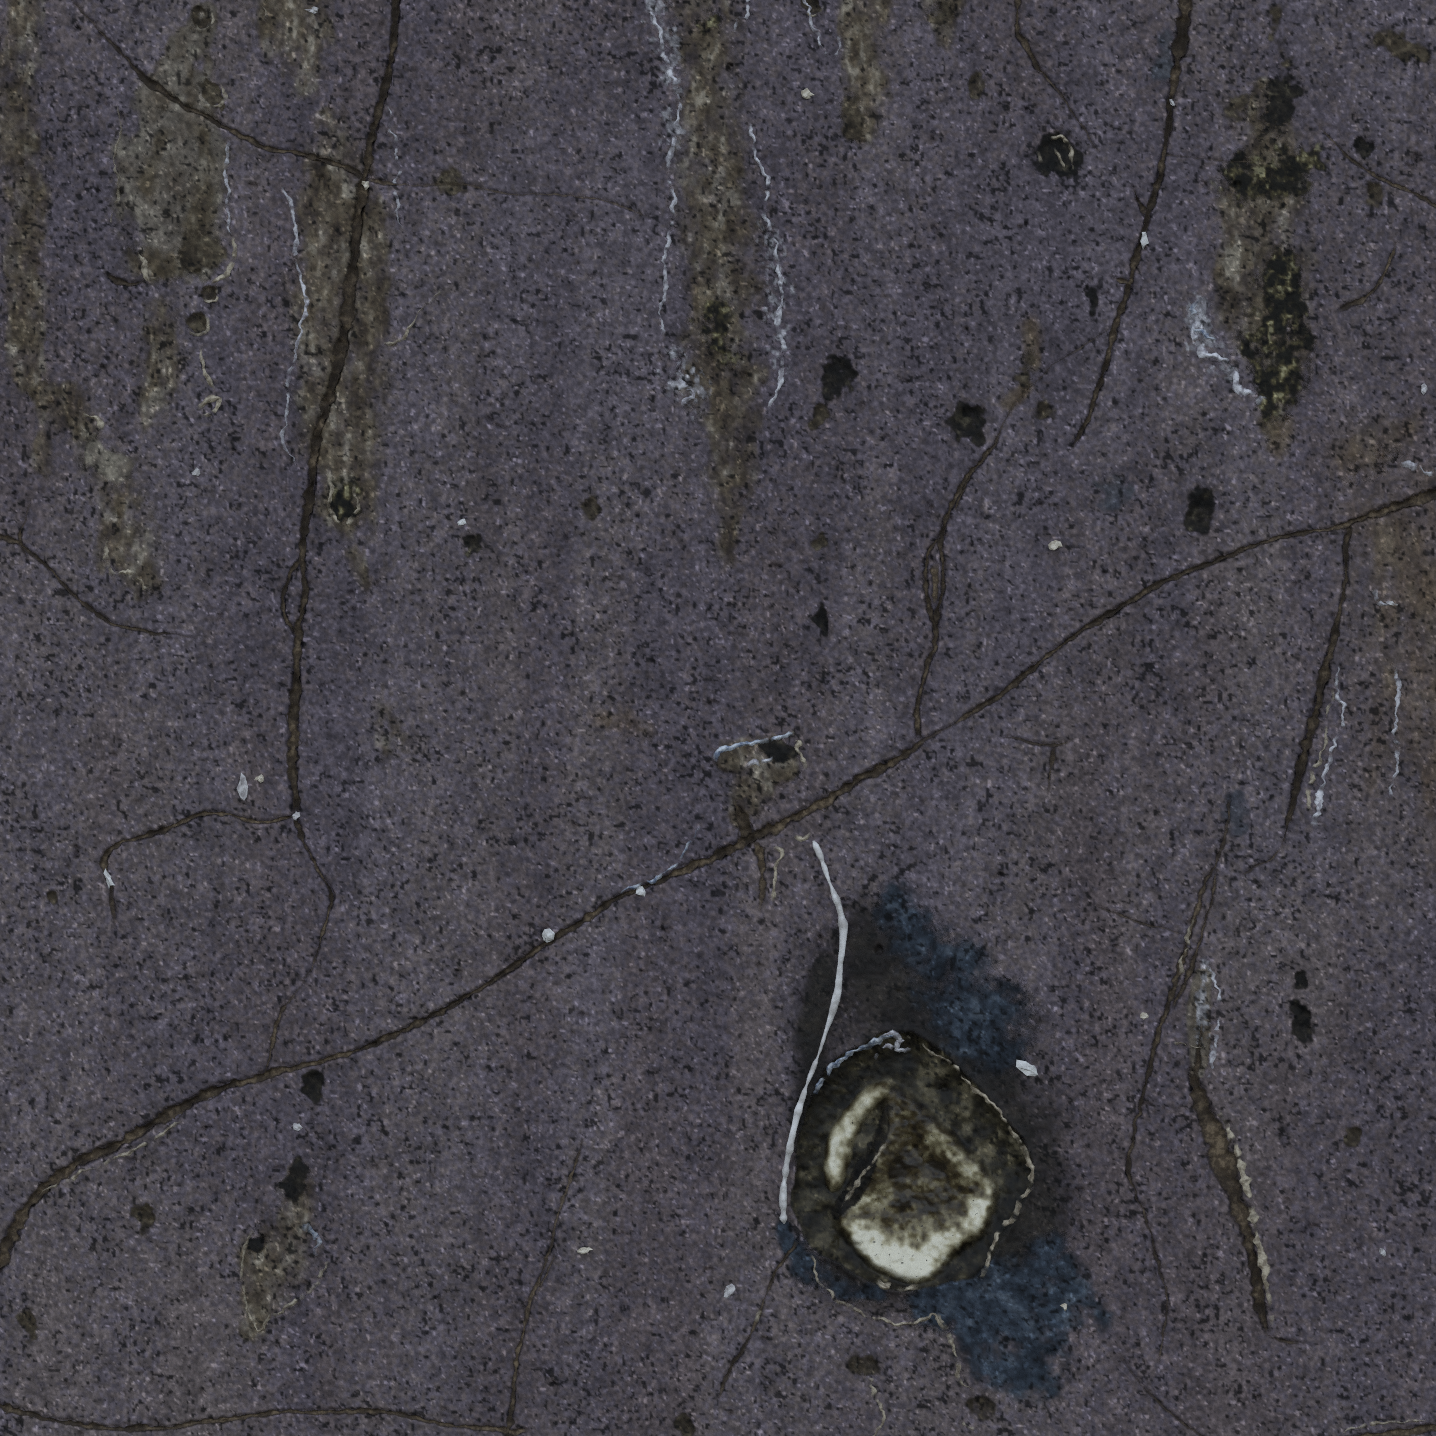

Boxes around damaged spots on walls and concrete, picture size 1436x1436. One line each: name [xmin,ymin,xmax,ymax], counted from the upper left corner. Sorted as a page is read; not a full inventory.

damp [141,304,178,422]
crack [72,0,410,975]
damp [646,0,789,560]
damp [801,0,890,141]
crack [1073,0,1193,445]
crack [0,413,1436,1268]
peeling [714,732,806,826]
crack [0,1141,582,1436]
spalling [790,1030,1034,1326]
damp [793,908,1061,1288]
spalling [1016,1060,1039,1076]
crack [1101,802,1230,1358]